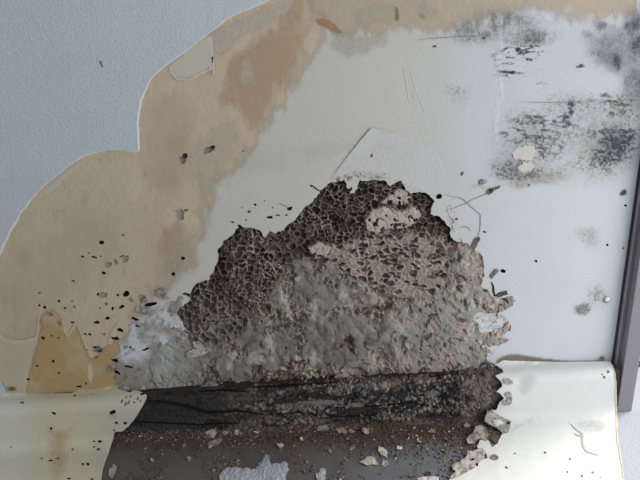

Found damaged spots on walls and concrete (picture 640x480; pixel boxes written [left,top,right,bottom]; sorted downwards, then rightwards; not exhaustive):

damp [0,0,640,378]
spalling [174,209,188,221]
crack [446,185,501,246]
peeling [127,288,170,316]
spalling [386,237,516,374]
peeling [168,327,212,358]
crack [133,381,440,426]
peeling [318,425,347,434]
peeling [360,446,388,467]